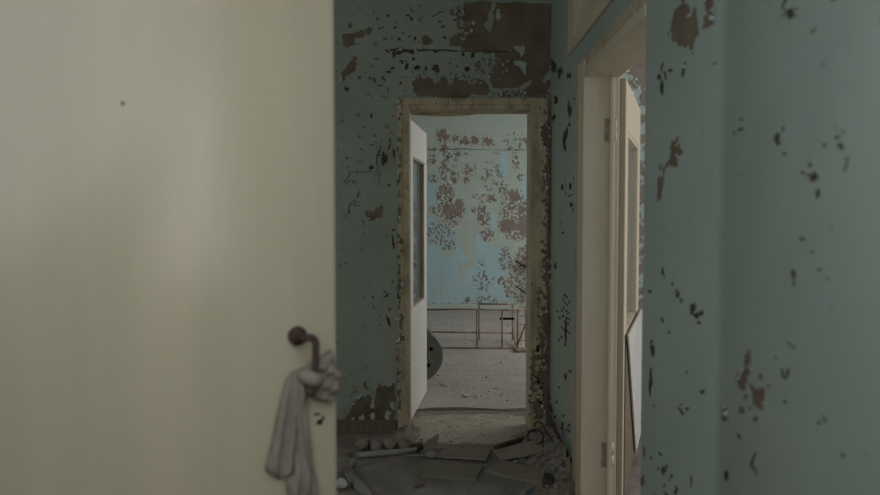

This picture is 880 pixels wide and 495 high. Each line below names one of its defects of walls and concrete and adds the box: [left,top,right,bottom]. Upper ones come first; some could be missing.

peeling [625,0,717,124]
peeling [339,0,575,460]
peeling [656,136,683,201]
peeling [721,350,770,422]